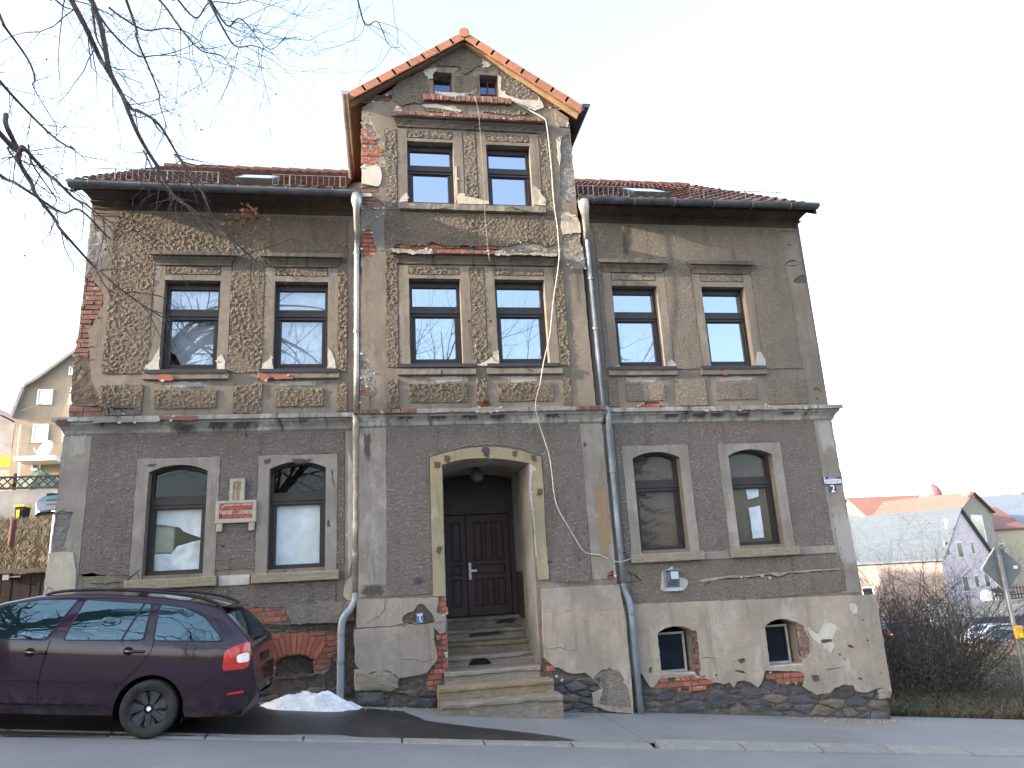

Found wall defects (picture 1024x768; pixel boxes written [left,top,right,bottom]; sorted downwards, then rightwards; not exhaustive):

spalling [360,59,581,258]
flaking render [57,227,198,454]
flaking render [247,605,356,699]
flaking render [397,597,448,691]
peeling [594,667,631,710]
peeling [764,620,854,685]